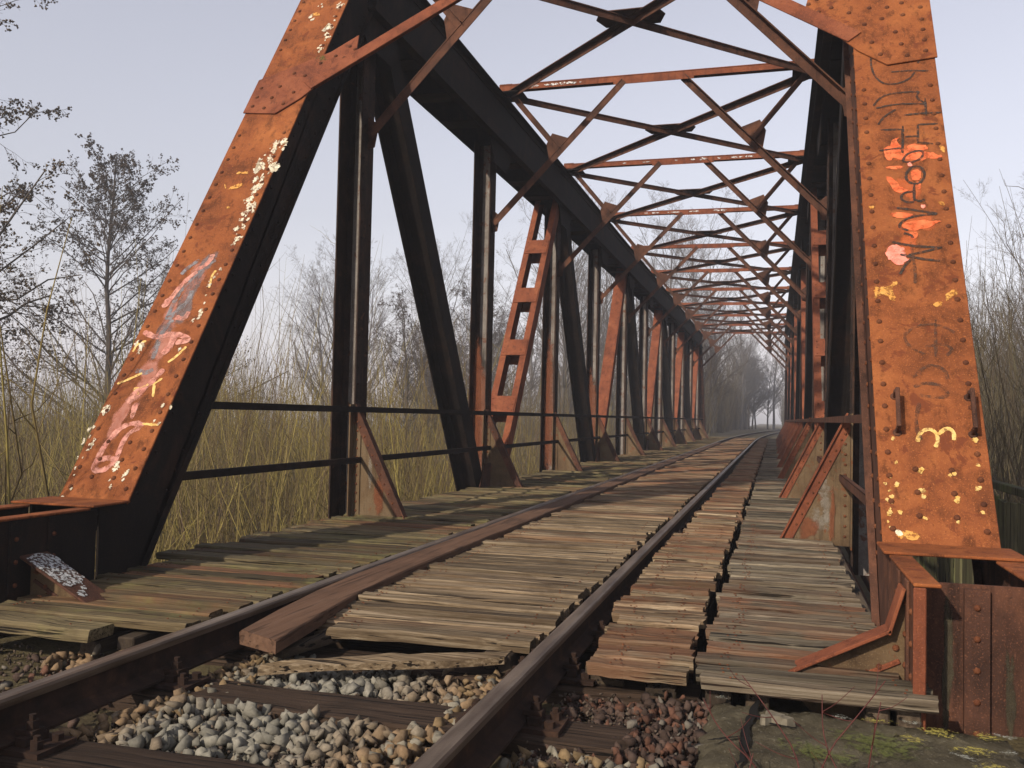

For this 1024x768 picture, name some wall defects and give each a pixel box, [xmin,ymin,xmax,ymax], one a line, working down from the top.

peeling [224,138,288,245]
corrosion [543,342,553,465]
corrosion [801,478,835,541]
peeling [883,477,921,541]
crack [707,700,798,768]